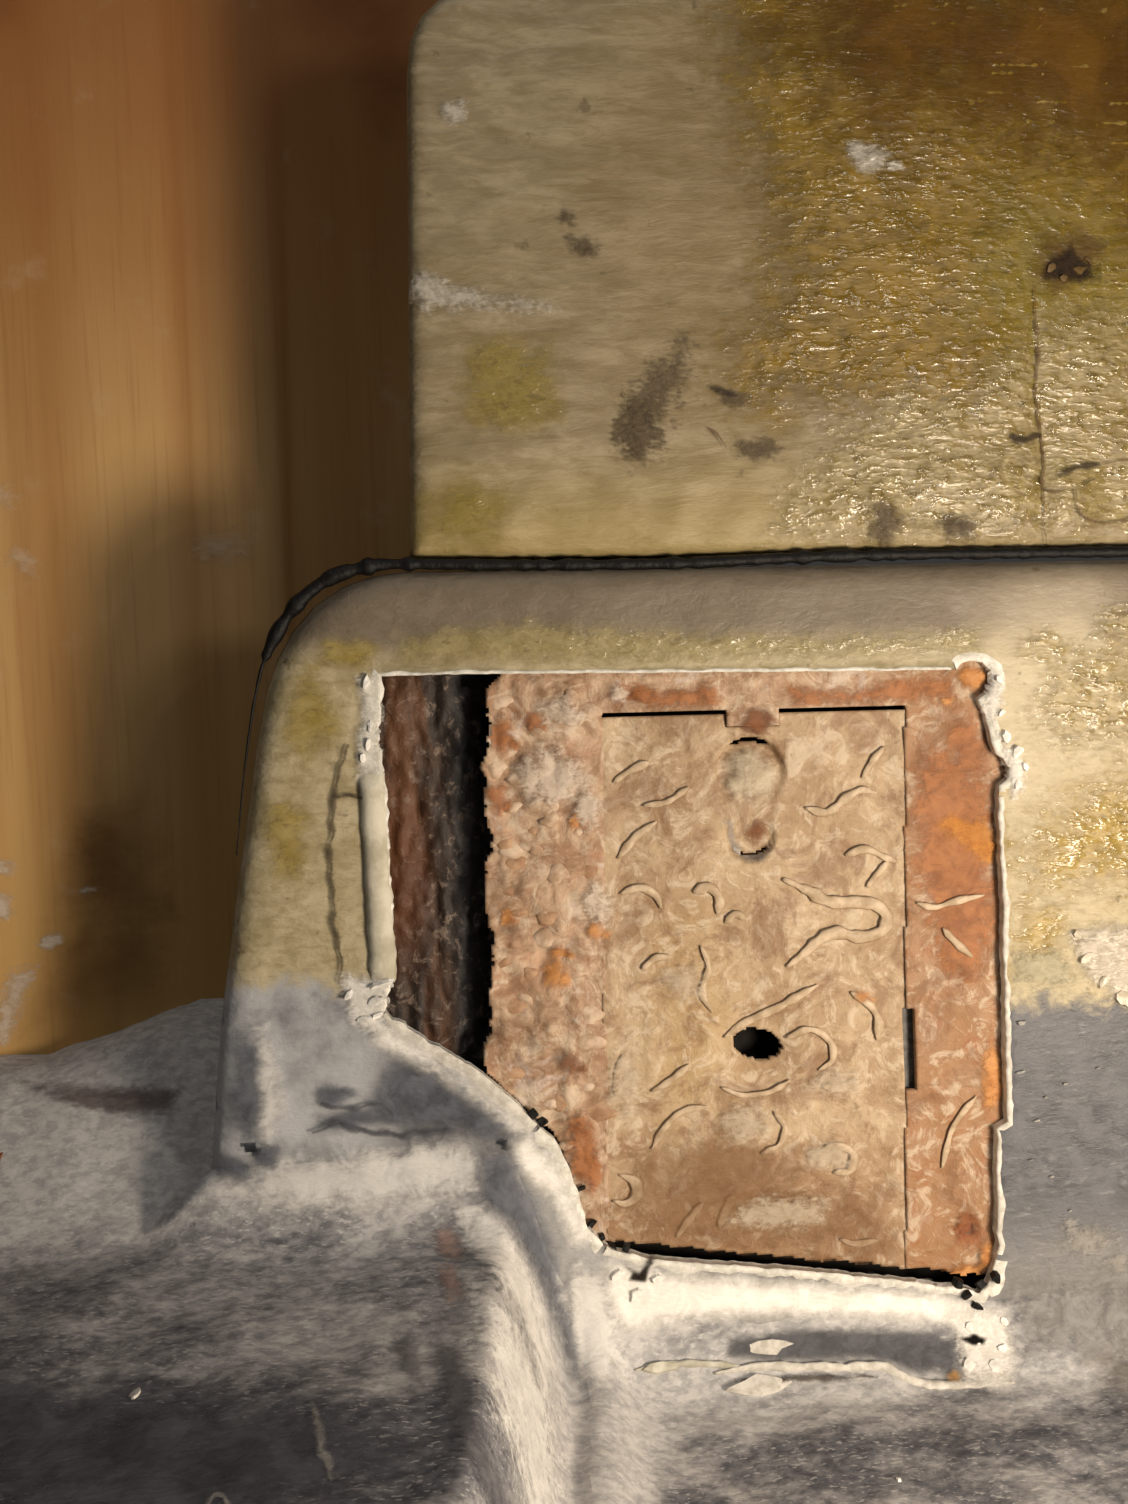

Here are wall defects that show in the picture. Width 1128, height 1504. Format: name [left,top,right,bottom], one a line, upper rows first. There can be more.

damp [722,0,1128,424]
damp [612,338,690,461]
crack [1010,292,1128,541]
damp [870,503,905,549]
damp [939,513,978,544]
corrosion [745,709,773,733]
corrosion [788,668,987,705]
corrosion [910,722,998,983]
damp [1035,782,1128,885]
peeling [1013,926,1128,1007]
corrosion [982,1048,1003,1107]
corrosion [951,1244,992,1276]